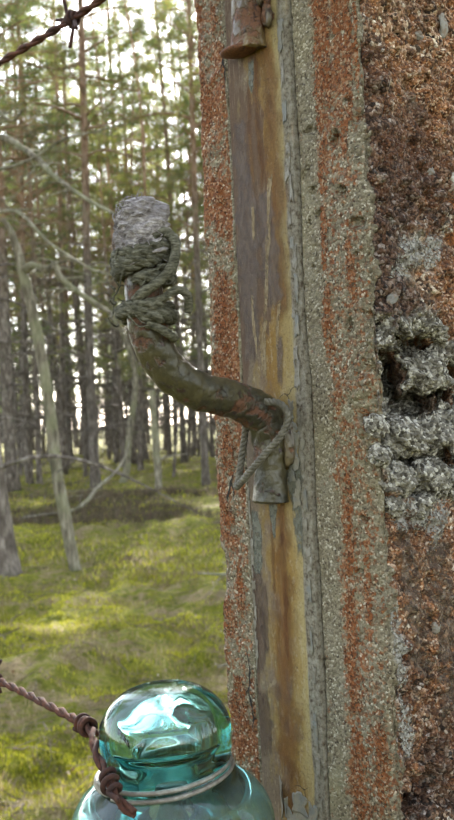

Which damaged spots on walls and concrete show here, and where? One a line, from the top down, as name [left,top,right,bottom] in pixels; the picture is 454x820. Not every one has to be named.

peeling [290,235,300,391]
spalling [350,300,454,520]
peeling [279,775,323,820]